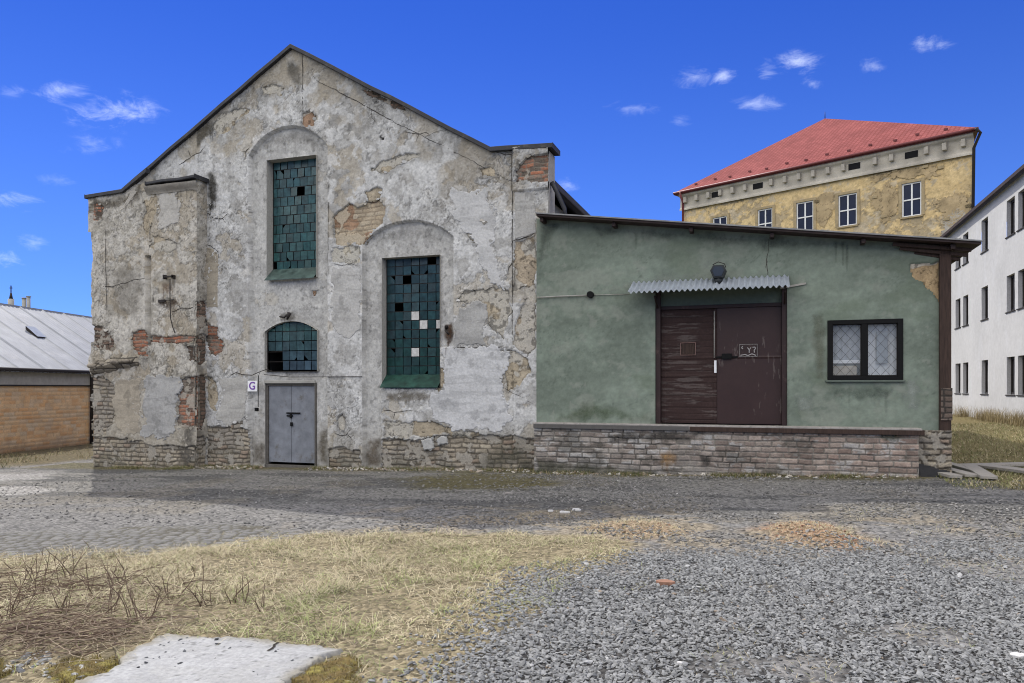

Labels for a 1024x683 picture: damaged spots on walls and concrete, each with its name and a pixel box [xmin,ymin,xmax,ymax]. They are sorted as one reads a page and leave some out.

flaking render [300,108,316,127]
flaking render [516,153,548,185]
flaking render [94,203,104,221]
flaking render [332,187,385,265]
crack [302,61,534,339]
flaking render [910,261,939,302]
flaking render [456,237,537,391]
flaking render [93,301,251,468]
flaking render [329,447,362,468]
flaking render [381,420,534,470]